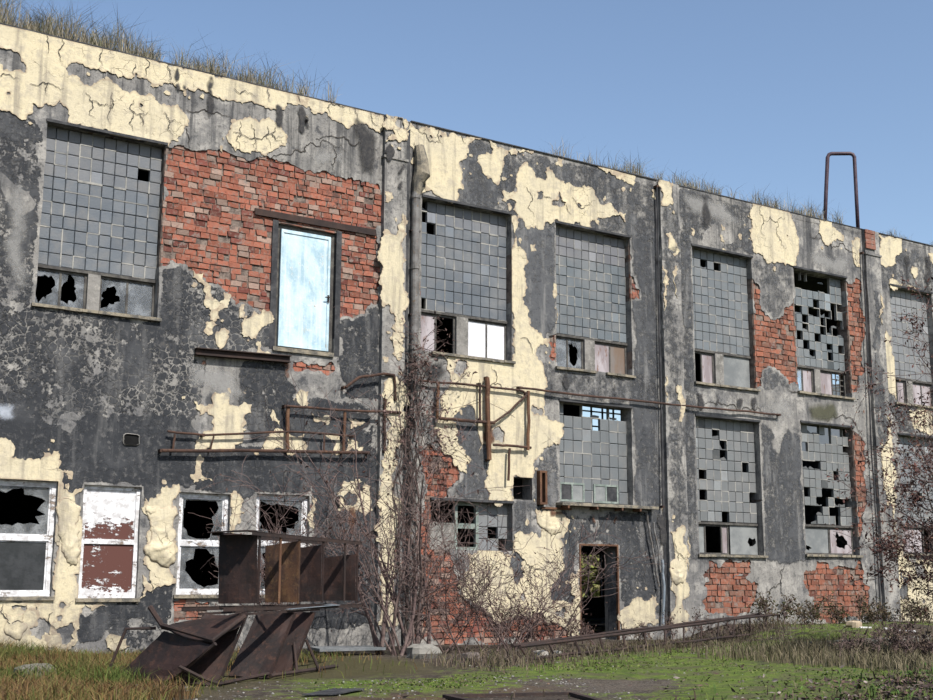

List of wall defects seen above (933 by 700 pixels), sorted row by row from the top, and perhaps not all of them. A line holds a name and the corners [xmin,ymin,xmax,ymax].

flaking render [0,24,799,651]
peeling [761,423,870,624]
flaking render [818,220,933,621]